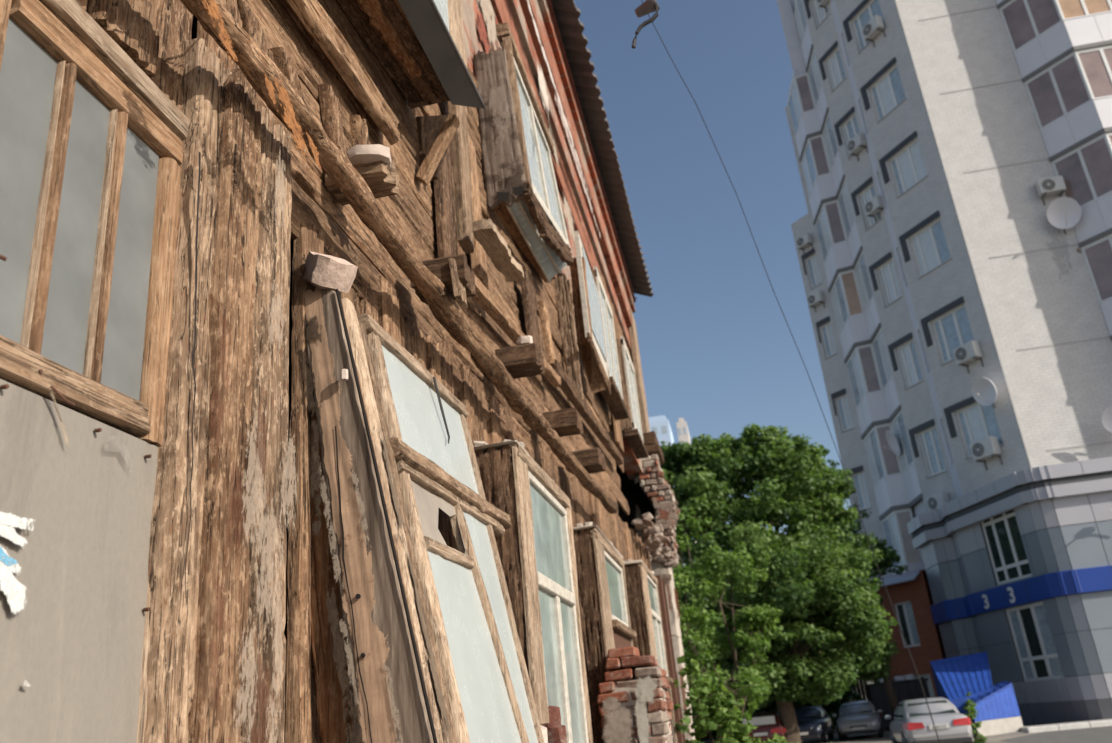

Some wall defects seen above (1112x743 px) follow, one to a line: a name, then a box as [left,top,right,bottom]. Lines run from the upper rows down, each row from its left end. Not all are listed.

peeling [274,144,286,230]
peeling [268,284,285,350]
peeling [233,316,362,743]
peeling [351,473,372,548]
spalling [639,454,680,585]
peeling [602,697,622,711]
peeling [637,675,658,704]